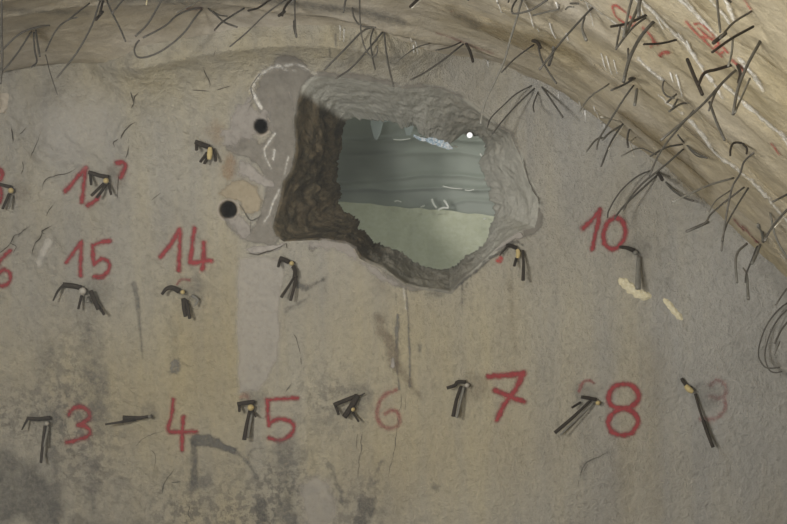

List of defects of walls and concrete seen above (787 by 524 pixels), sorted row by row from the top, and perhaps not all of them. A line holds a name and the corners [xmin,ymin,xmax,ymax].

spalling [309,239,417,291]
spalling [454,208,543,289]
leakage [188,434,236,489]